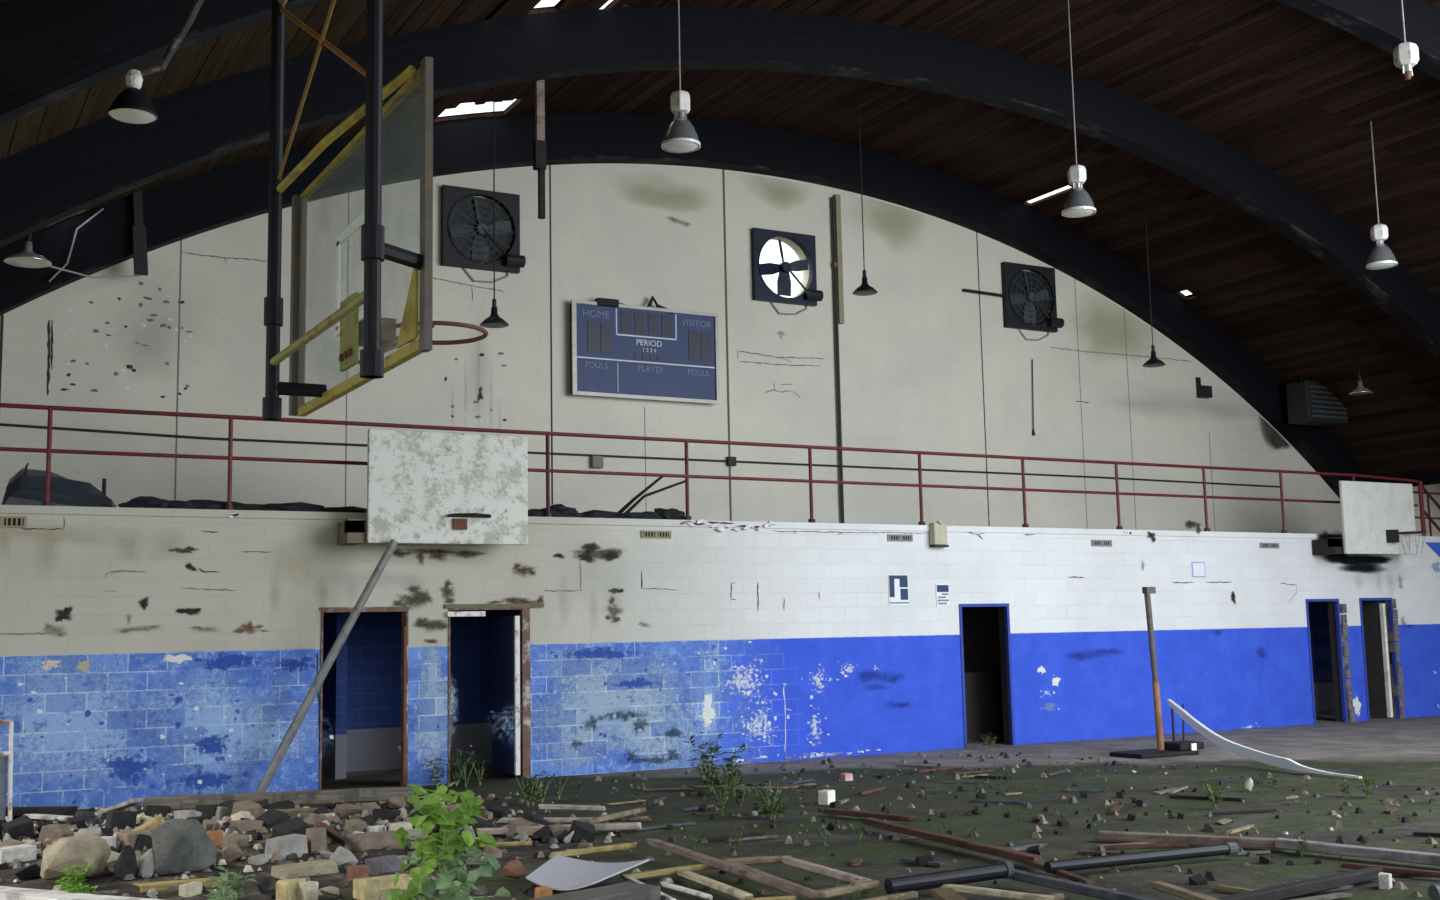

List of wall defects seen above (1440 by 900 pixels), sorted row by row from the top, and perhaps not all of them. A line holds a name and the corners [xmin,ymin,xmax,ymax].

peeling [0,652,334,795]
peeling [490,641,881,768]
peeling [1037,666,1061,710]